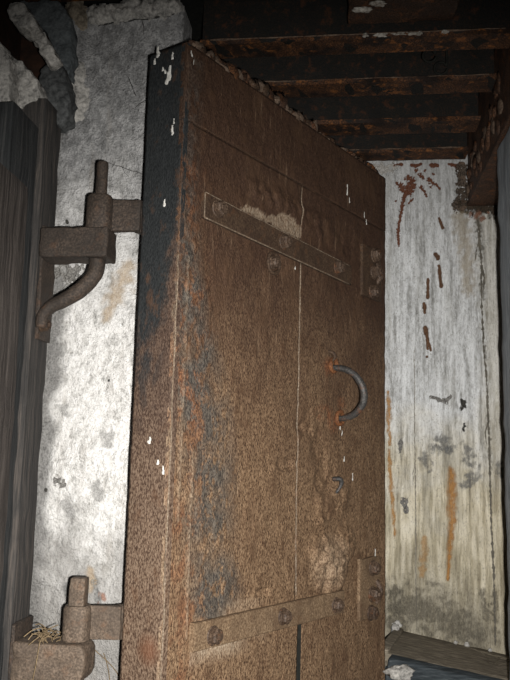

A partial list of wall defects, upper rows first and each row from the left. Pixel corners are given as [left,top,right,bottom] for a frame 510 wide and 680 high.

rust [187,39,380,175]
rust [466,87,503,180]
rust [393,163,441,247]
rust [422,278,430,314]
rust [433,252,443,288]
rust [423,326,432,358]
rust [386,391,396,536]
leakage [422,437,453,473]
leakage [460,446,480,488]
rust [447,468,456,581]